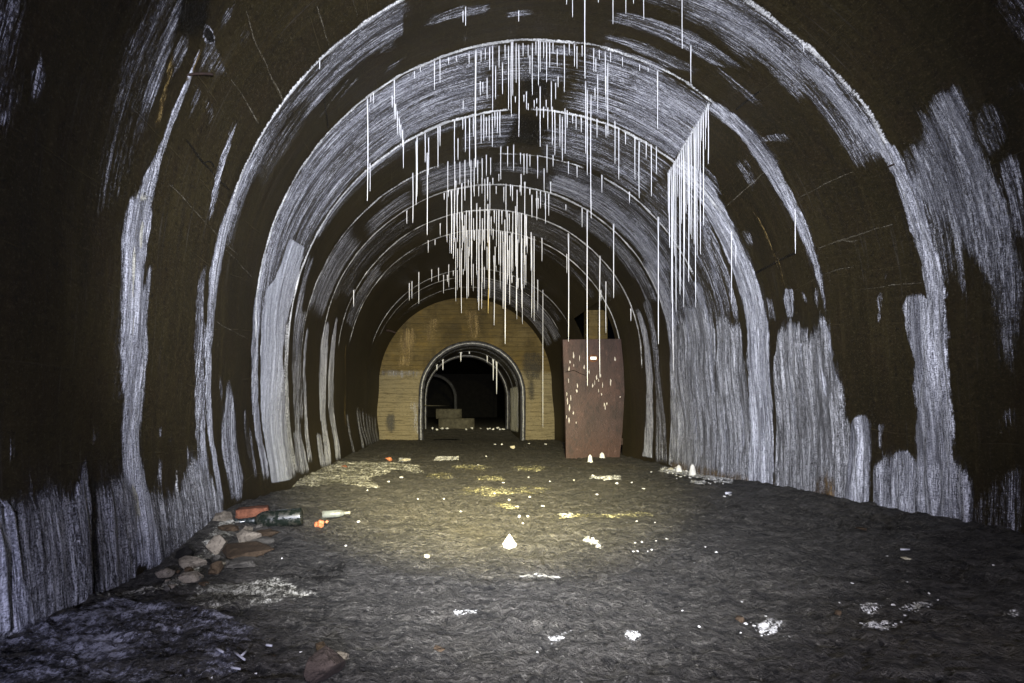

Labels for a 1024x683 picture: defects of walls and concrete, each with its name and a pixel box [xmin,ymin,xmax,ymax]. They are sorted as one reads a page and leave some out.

damp [120,0,224,568]
damp [91,479,345,609]
damp [187,0,825,509]
damp [553,511,653,520]
damp [613,0,1022,517]
damp [989,474,1019,530]